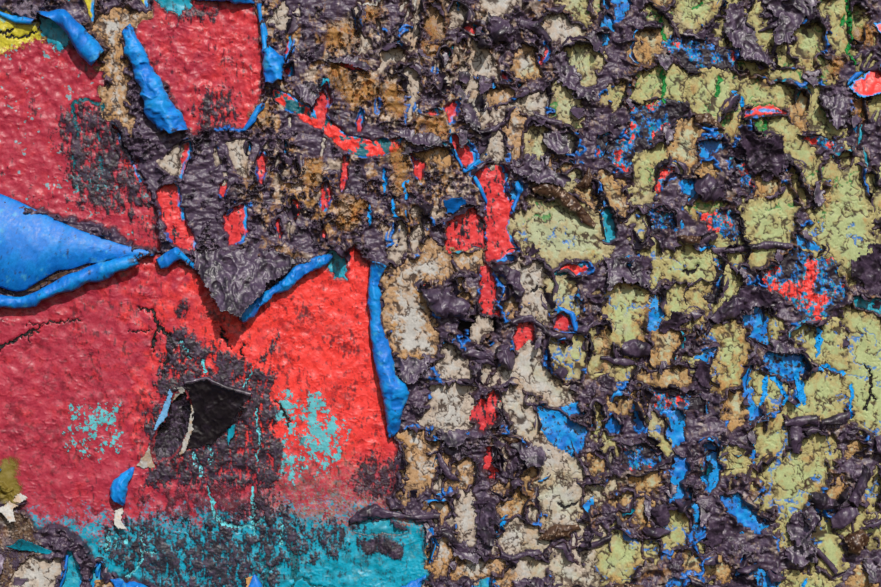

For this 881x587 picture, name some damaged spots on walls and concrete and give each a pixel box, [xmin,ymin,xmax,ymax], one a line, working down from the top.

peeling [433,40,459,95]
peeling [510,40,547,81]
peeling [398,61,424,122]
peeling [846,53,881,124]
peeling [472,175,488,205]
peeling [503,180,523,212]
crack [0,318,81,351]
peeling [462,349,497,386]
peeling [237,421,261,466]
peeling [844,437,877,460]
peeling [234,542,270,587]
peeling [845,557,879,587]